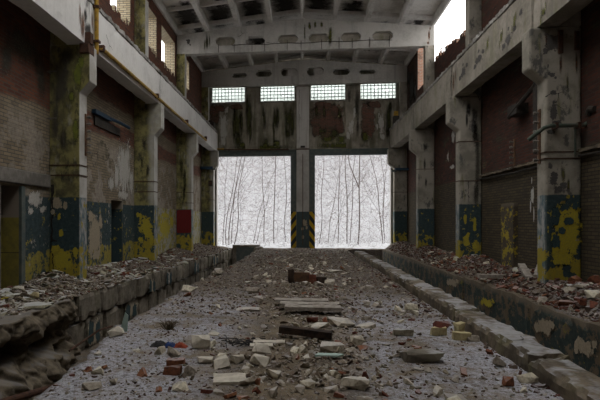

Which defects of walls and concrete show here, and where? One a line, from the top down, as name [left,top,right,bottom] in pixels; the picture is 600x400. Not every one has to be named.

leakage [232,98,252,146]
leakage [262,108,294,147]
flaking render [310,101,385,140]
leakage [348,90,359,133]
peeling [108,140,134,200]
peeling [27,190,67,220]
peeling [51,228,79,270]
peeling [88,208,103,260]
peeling [136,211,174,245]
peeling [550,201,582,265]
peeling [534,318,555,336]
peeling [574,336,597,358]